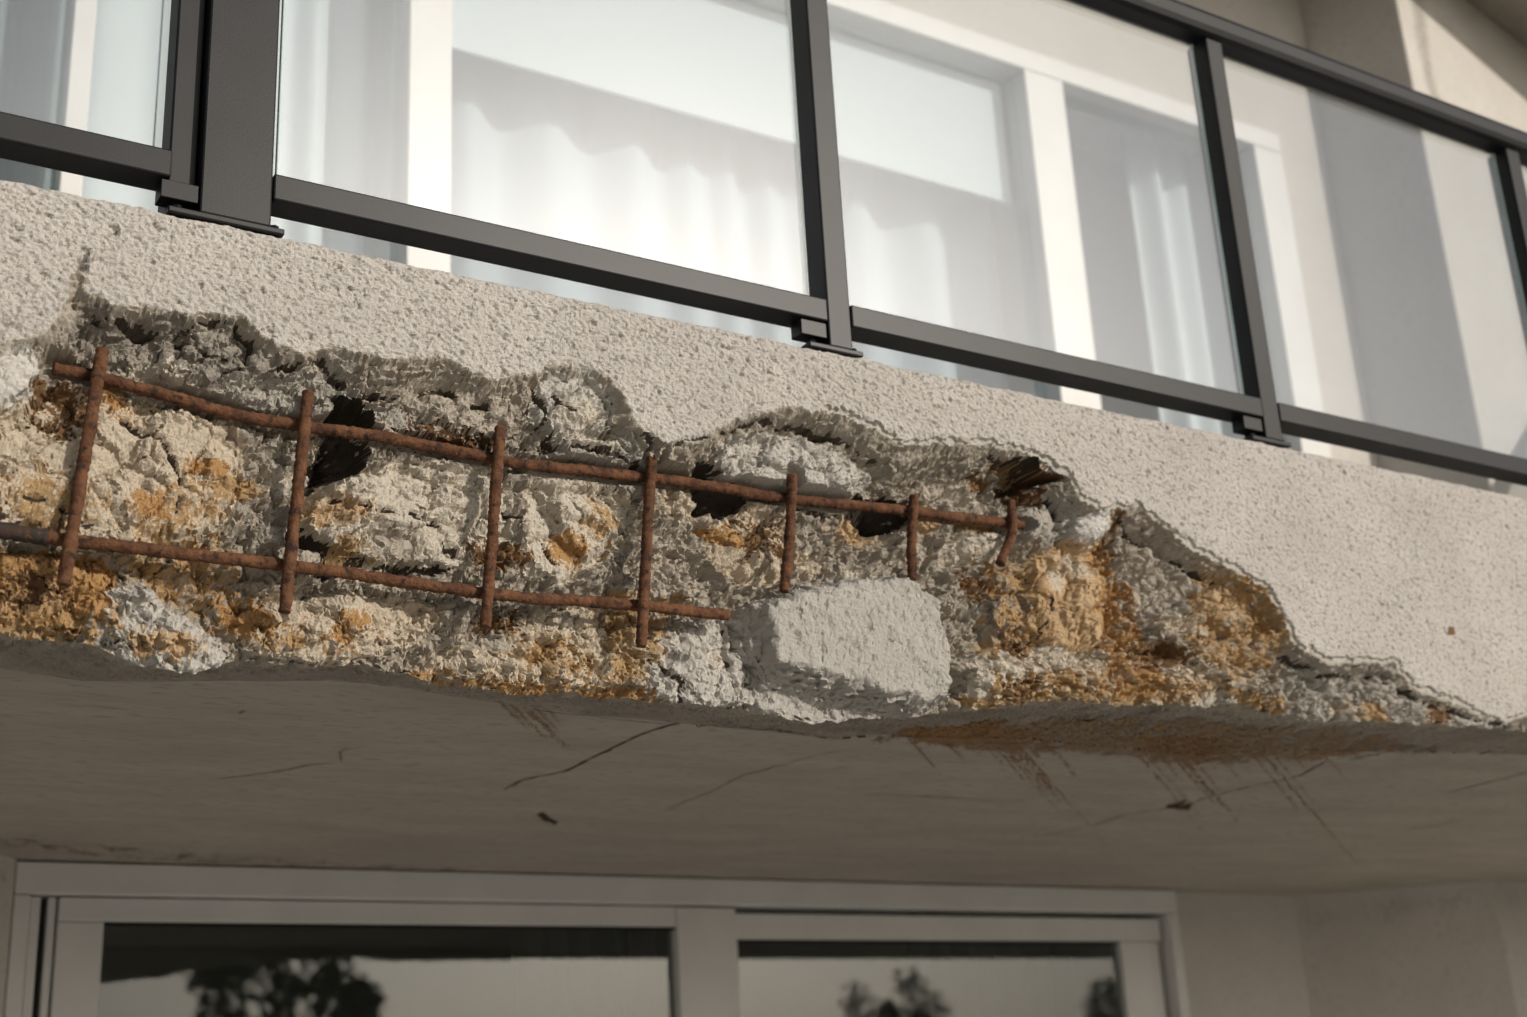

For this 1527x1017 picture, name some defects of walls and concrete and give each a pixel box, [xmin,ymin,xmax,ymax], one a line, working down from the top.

corrosion [404,412,507,466]
corrosion [0,372,285,664]
corrosion [300,487,391,571]
corrosion [456,540,536,574]
corrosion [724,512,784,564]
spalling [0,269,1527,733]
corrosion [814,516,886,552]
corrosion [247,603,385,660]
corrosion [398,588,692,748]
crack [720,630,730,669]
corrosion [896,459,1292,843]
crack [504,659,877,810]